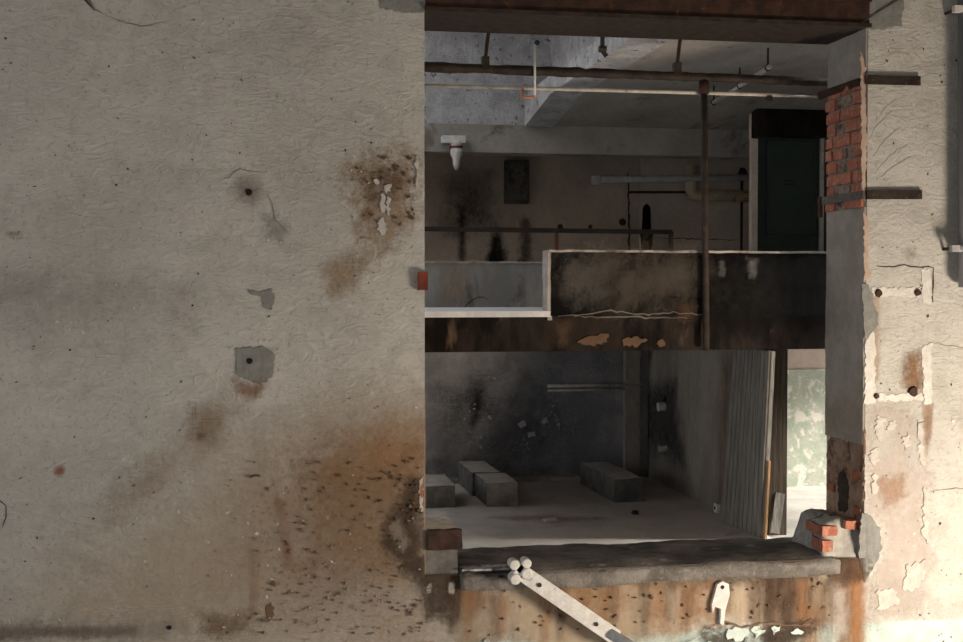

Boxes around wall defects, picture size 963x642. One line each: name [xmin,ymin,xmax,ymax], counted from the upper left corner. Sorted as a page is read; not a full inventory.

crack [84,0,162,27]
rust [351,150,419,253]
rust [193,429,607,642]
rust [559,558,863,642]
peeling [686,618,813,642]